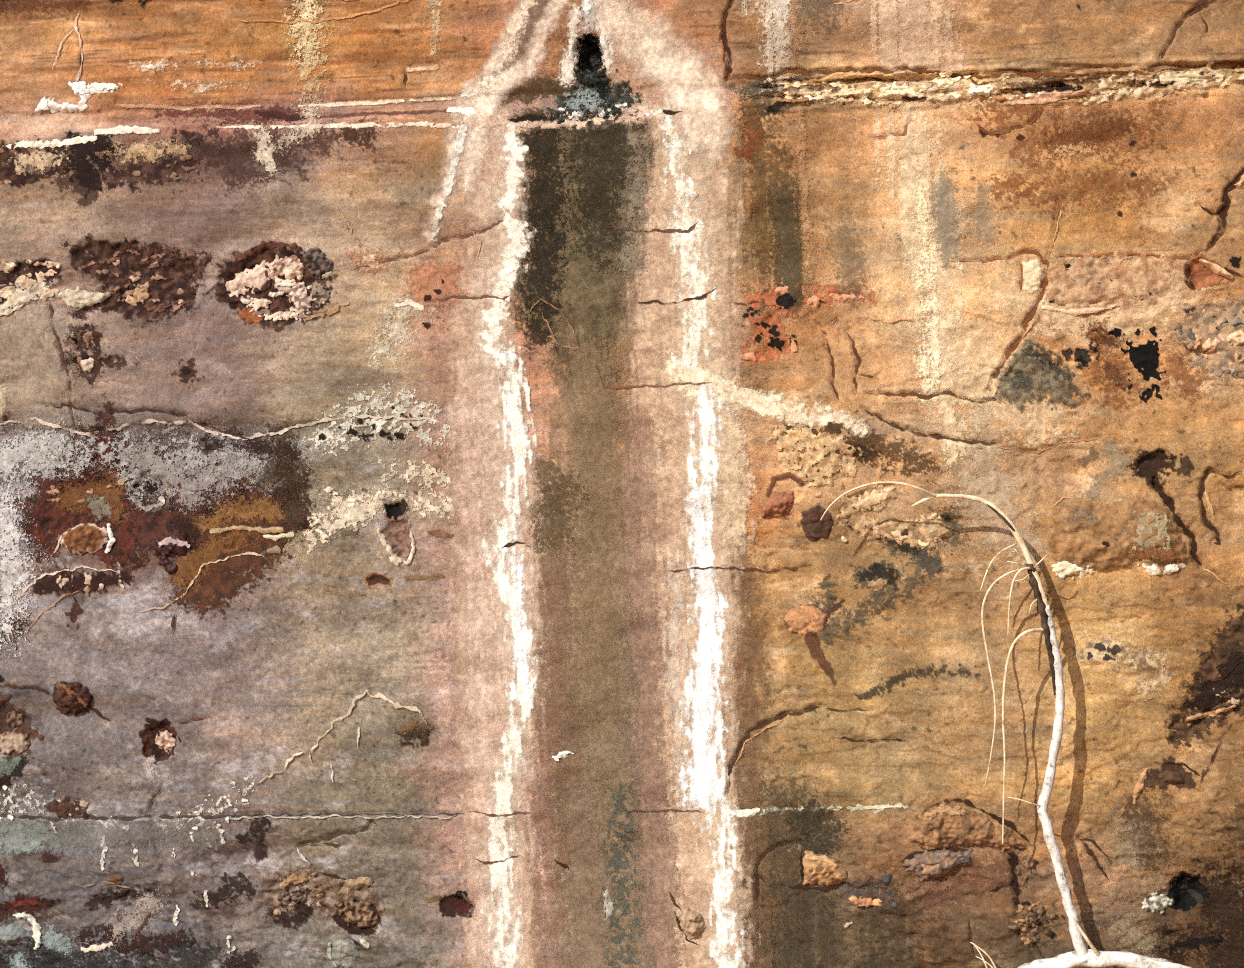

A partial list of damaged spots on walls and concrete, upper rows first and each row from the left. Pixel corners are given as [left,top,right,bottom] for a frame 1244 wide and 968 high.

damp [6,125,160,149]
crack [719,0,1244,138]
spalling [1000,70,1179,105]
crack [1171,170,1244,259]
spalling [0,232,349,332]
damp [0,406,279,661]
corrosion [7,401,324,655]
damp [268,0,1244,968]
crack [1154,469,1244,583]
damp [0,675,51,695]
spalling [262,864,386,938]